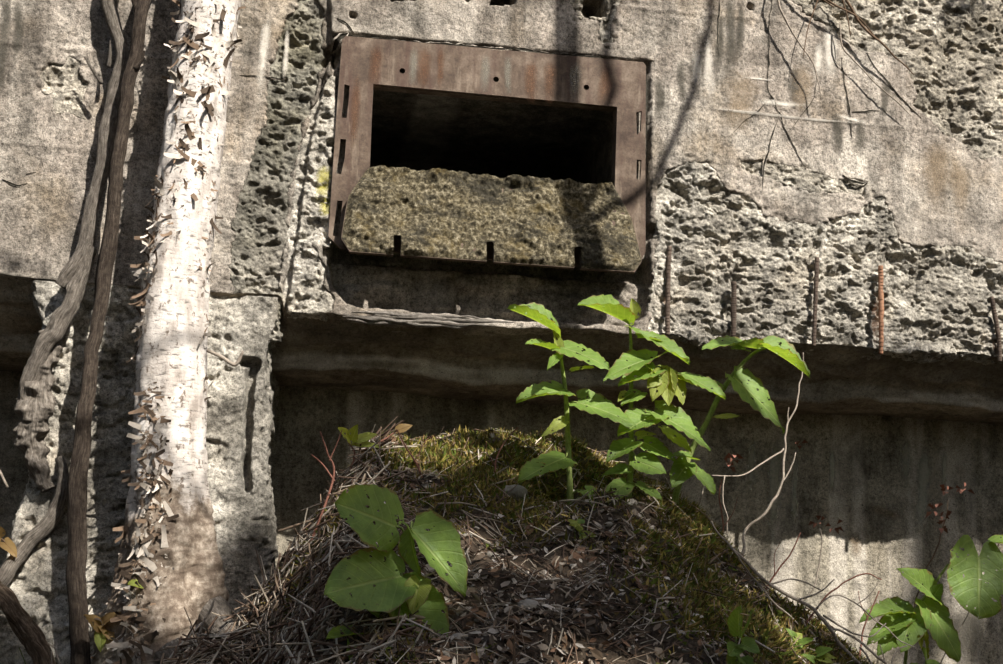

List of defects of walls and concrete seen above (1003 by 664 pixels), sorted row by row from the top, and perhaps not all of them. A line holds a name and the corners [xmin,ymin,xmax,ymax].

spalling [646,160,1003,366]